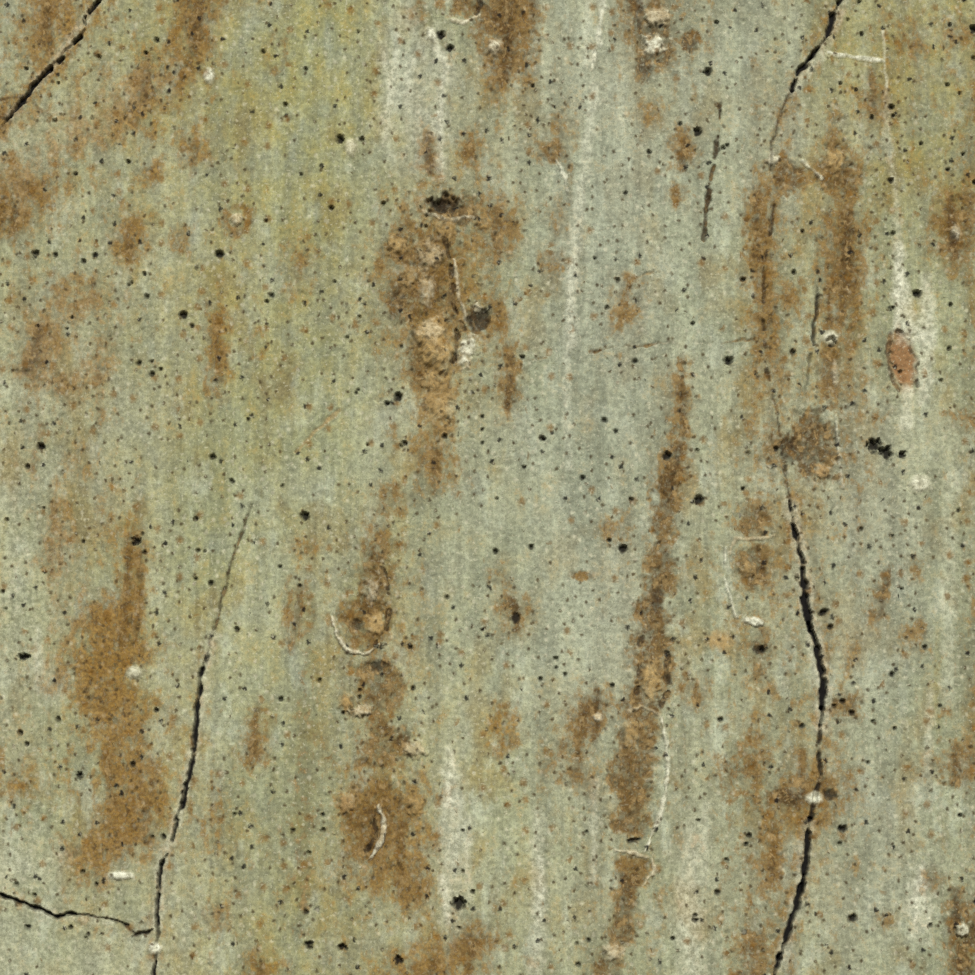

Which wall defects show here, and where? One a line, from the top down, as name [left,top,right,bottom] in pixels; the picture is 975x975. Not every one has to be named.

crack [0,0,102,131]
corrosion [0,0,283,975]
peeling [365,168,499,451]
corrosion [413,0,587,447]
corrosion [641,322,704,502]
crack [699,102,724,249]
crack [719,203,829,975]
crack [768,0,844,174]
corrosion [735,137,881,409]
spalling [883,320,921,397]
crack [0,502,253,975]
corrosion [315,757,514,975]